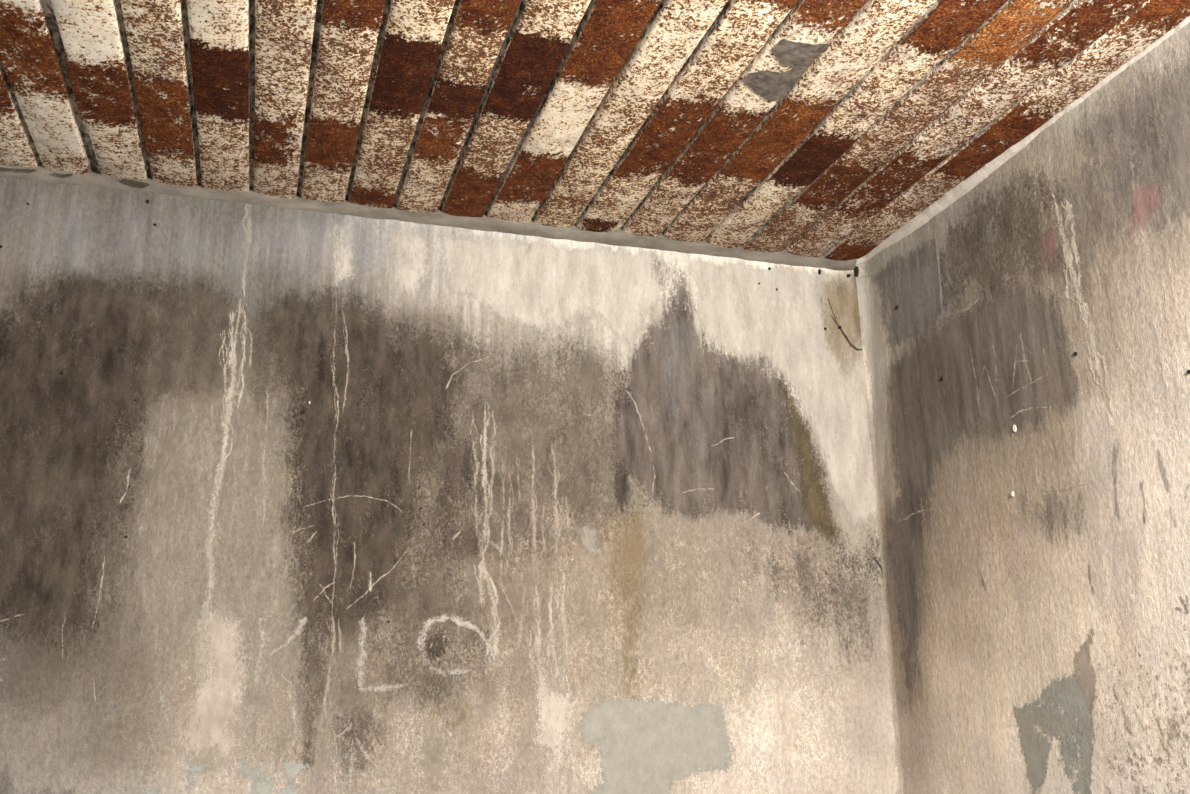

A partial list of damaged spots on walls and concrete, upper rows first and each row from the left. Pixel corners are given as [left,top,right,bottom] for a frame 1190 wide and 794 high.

rust [0,0,662,217]
peeling [742,39,829,101]
rust [736,0,868,36]
rust [613,93,1062,217]
rust [902,0,1190,71]
rust [578,218,619,232]
leakage [750,52,1190,689]
leakage [0,206,877,794]
peeling [576,697,737,794]
peeling [1012,618,1190,794]